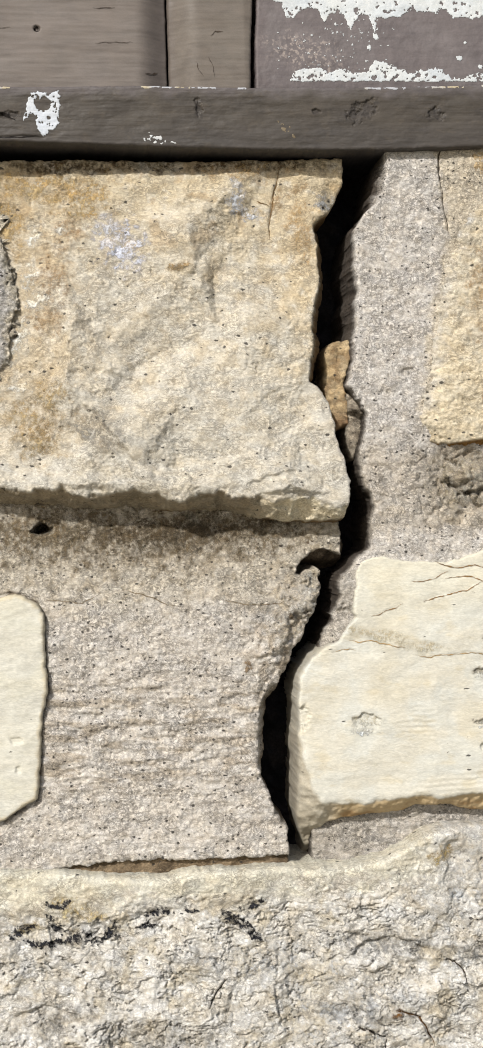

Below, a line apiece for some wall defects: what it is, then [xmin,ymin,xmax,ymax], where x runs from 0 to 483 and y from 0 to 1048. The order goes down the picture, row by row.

peeling [273,0,483,90]
peeling [23,91,61,136]
crack [257,169,279,240]
crack [310,178,362,385]
crack [47,589,181,607]
crack [339,604,483,658]
crack [413,563,482,601]
crack [226,497,353,845]